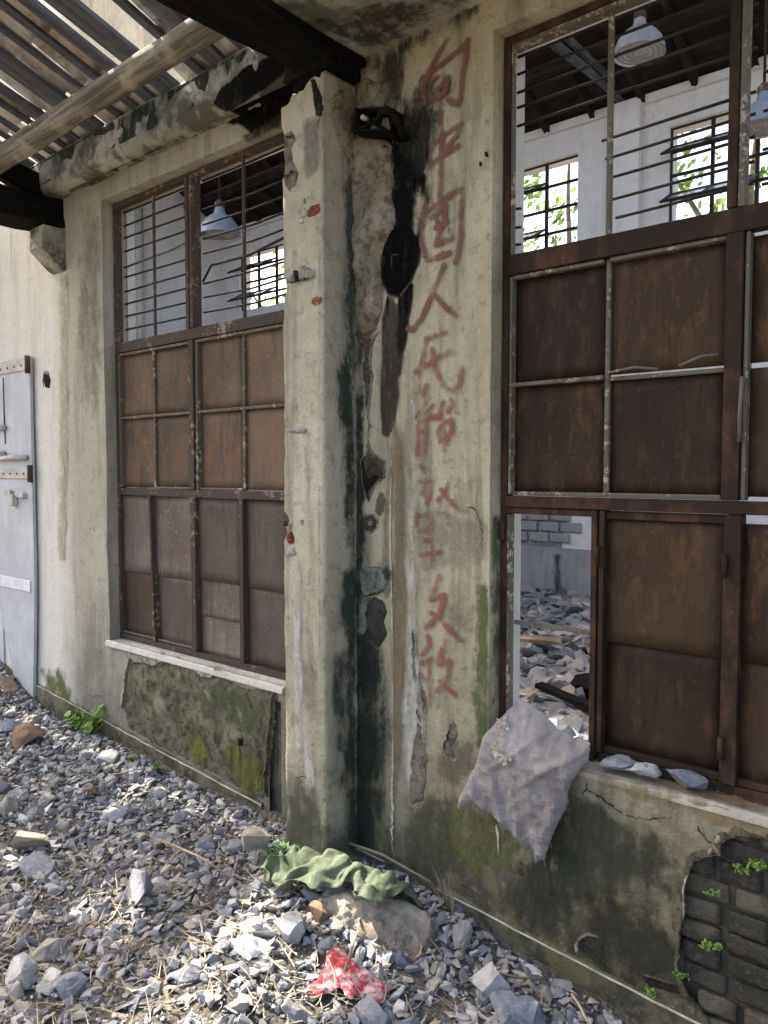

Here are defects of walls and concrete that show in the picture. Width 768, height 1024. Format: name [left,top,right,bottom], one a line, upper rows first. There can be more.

damp [167,48,300,133]
damp [30,100,158,169]
damp [70,145,167,193]
flaking render [360,440,386,534]
damp [332,176,454,881]
flaking render [358,597,387,654]
flaking render [410,628,471,805]
crack [582,781,671,821]
corrosion [626,780,766,834]
damp [507,803,683,992]
flaking render [641,827,768,1024]